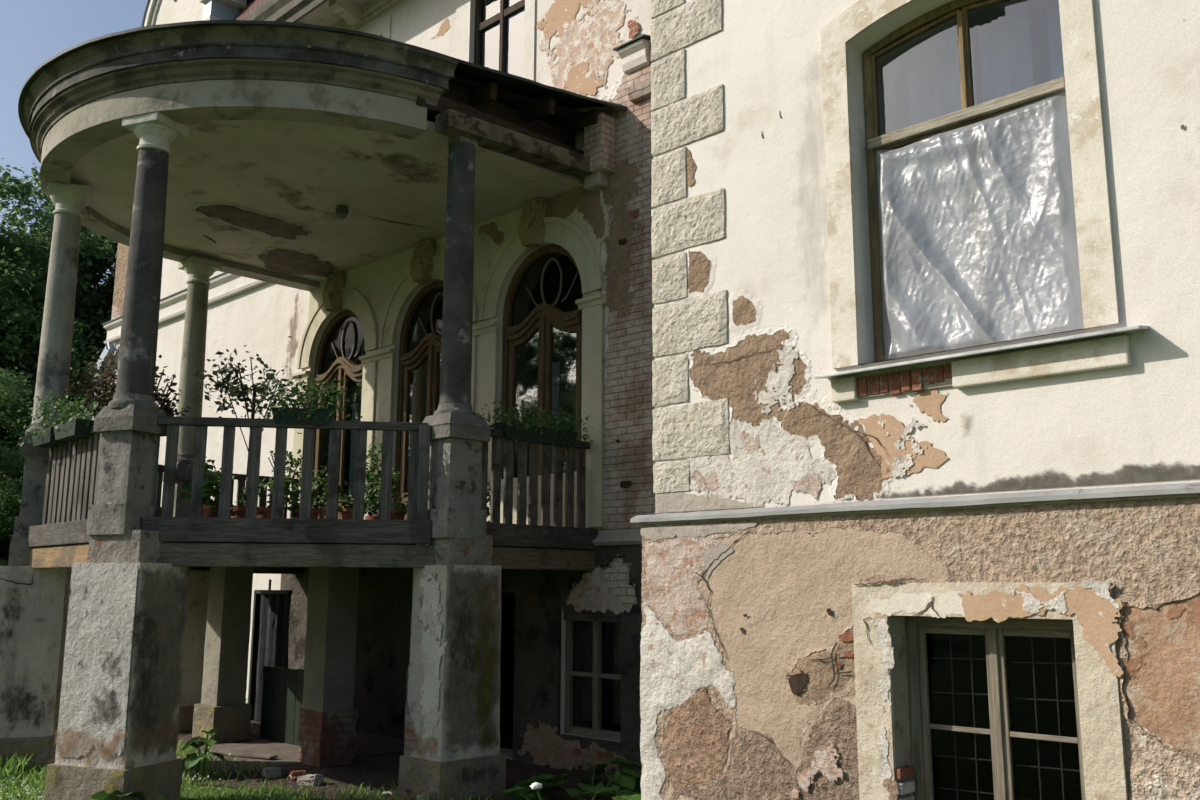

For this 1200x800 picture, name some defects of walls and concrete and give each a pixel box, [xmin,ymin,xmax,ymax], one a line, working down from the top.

peeling [111,243,129,320]
peeling [517,0,1200,800]
leakage [877,464,1200,498]
crack [696,531,748,660]
leakage [1,688,45,728]
leakage [92,571,188,763]